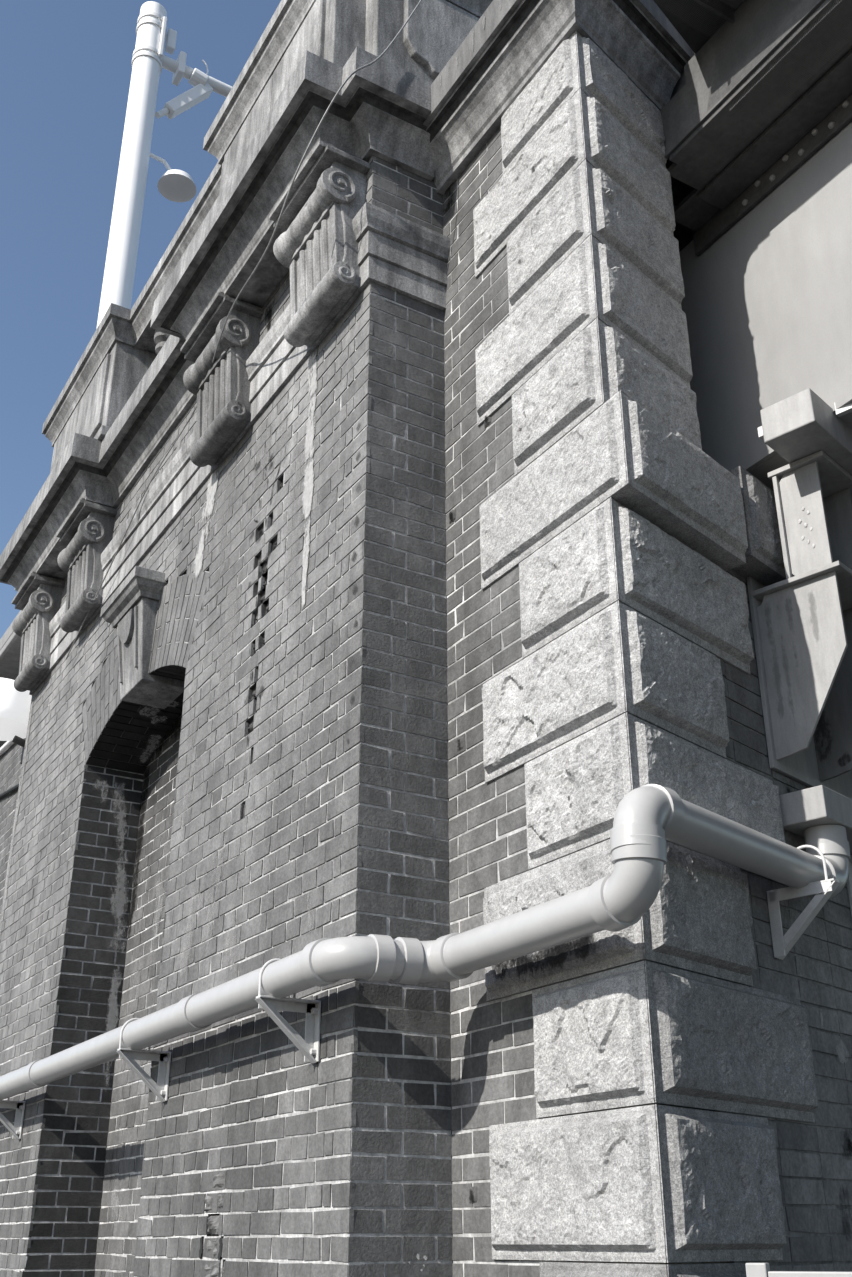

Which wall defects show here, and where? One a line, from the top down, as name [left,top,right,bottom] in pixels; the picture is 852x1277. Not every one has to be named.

damp [193,469,219,578]
damp [302,353,317,606]
crack [240,442,283,814]
damp [95,766,150,951]
damp [106,973,120,1032]